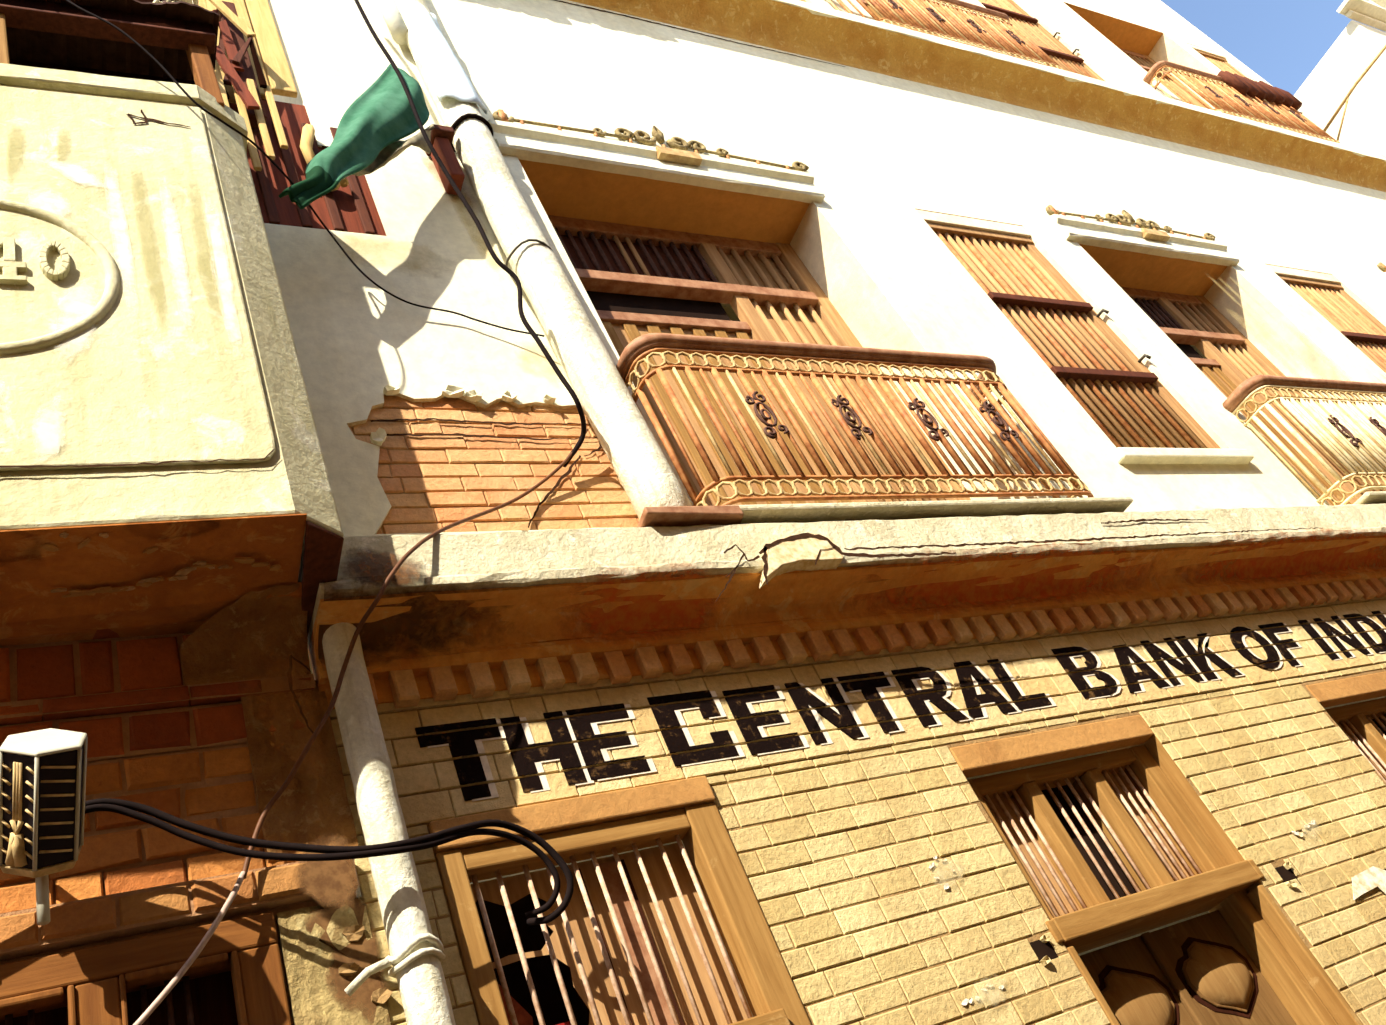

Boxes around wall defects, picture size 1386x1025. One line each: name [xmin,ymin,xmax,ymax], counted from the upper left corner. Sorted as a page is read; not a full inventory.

spalling [348,385,639,534]
crack [716,518,1322,601]
damp [318,624,334,662]
damp [324,549,493,666]
peeling [371,988,392,1005]